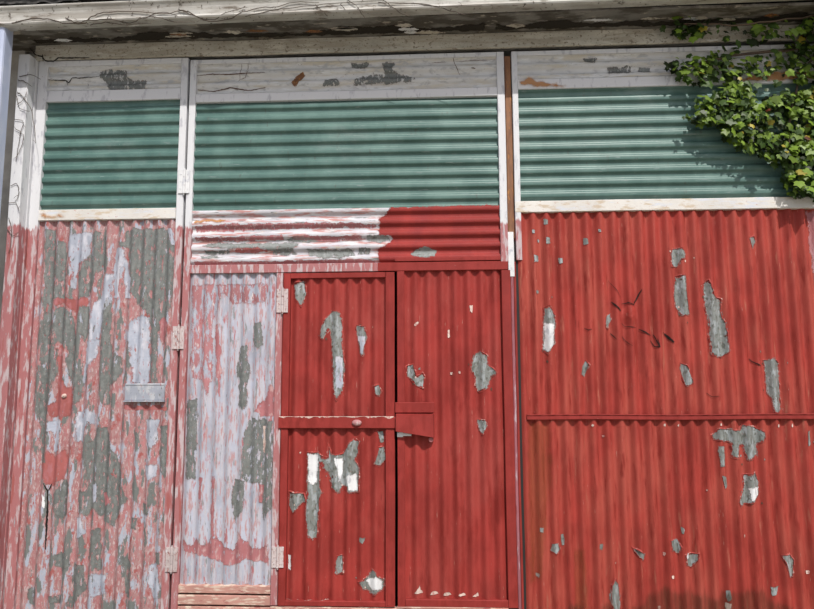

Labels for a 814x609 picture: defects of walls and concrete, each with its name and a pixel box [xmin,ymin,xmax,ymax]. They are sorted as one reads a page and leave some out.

rust [520,77,558,87]
peeling [201,234,391,259]
peeling [236,321,263,410]
peeling [318,310,346,402]
peeling [541,304,557,363]
crack [584,282,674,347]
peeling [701,279,730,359]
peeling [37,227,175,608]
peeling [231,416,394,523]
peeling [288,438,360,541]
peeling [710,423,766,507]
peeling [356,568,385,597]